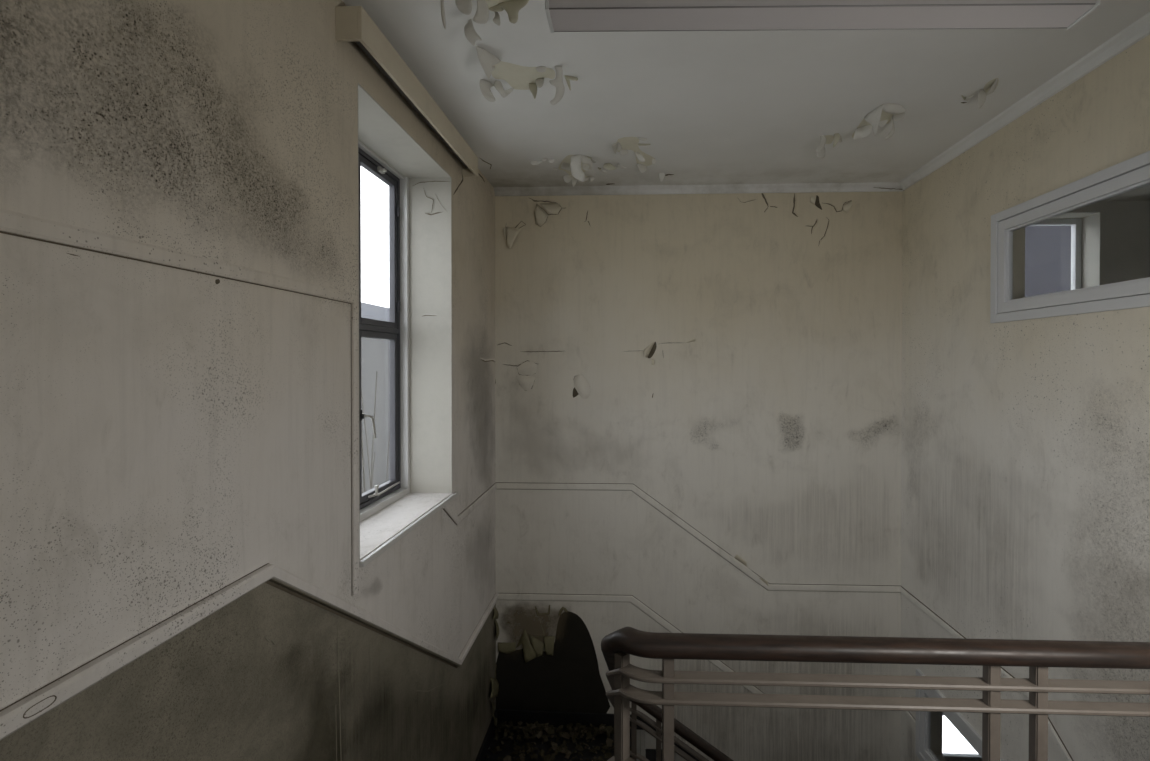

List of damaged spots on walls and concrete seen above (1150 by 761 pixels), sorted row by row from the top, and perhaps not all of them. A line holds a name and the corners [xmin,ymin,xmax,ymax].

peeling [441,0,578,105]
damp [6,2,304,251]
peeling [558,155,596,187]
crack [738,193,830,246]
peeling [622,339,696,365]